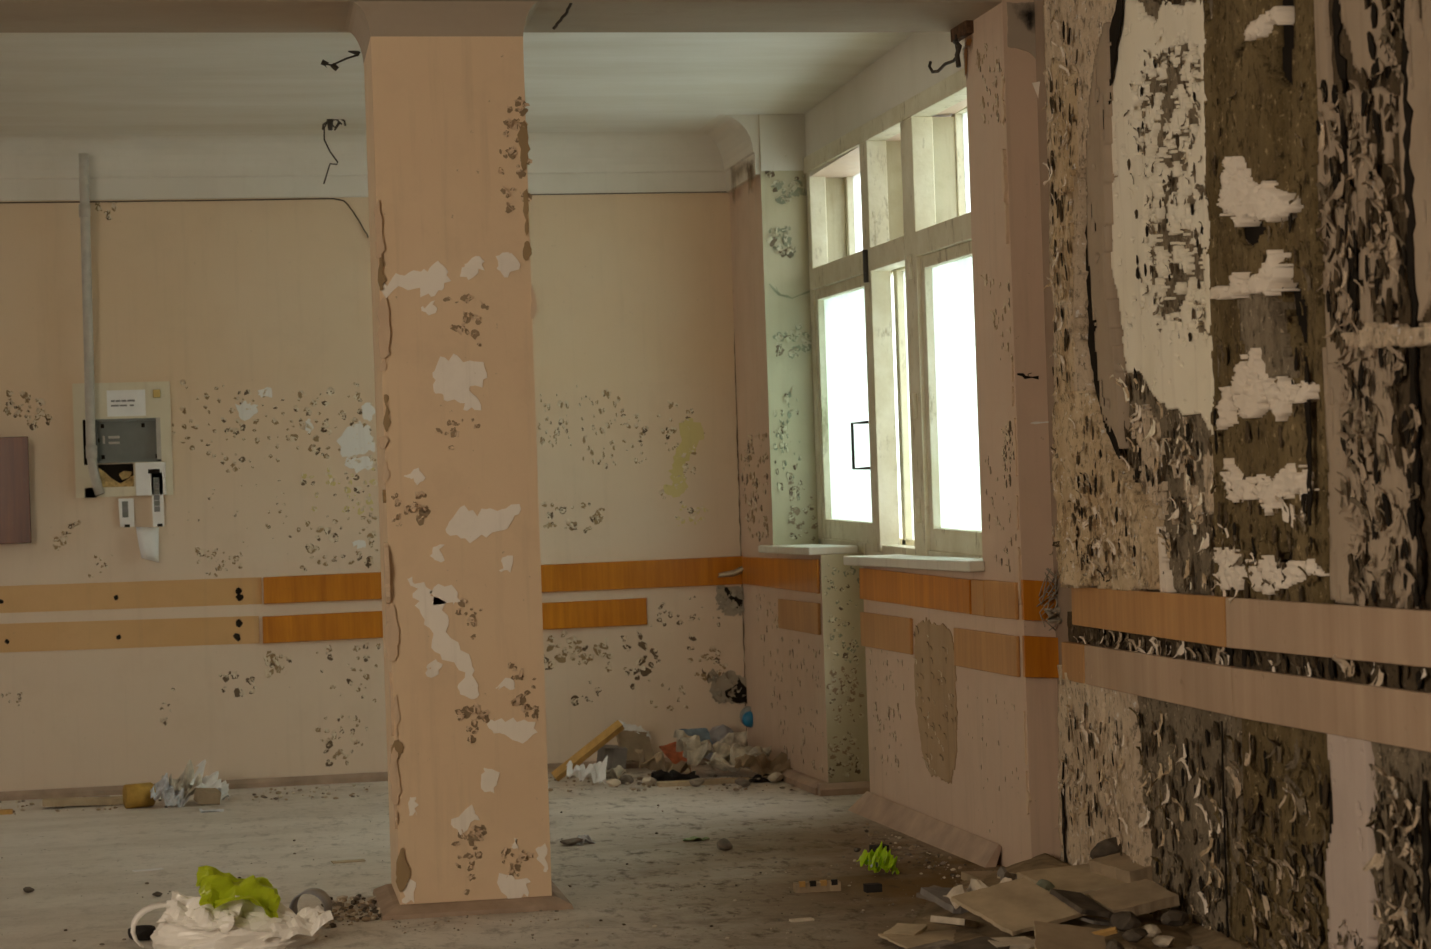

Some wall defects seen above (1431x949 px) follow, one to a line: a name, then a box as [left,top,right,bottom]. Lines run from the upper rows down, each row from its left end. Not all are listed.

flaking render [374,96,532,450]
spalling [98,464,134,487]
peeling [538,385,705,499]
peeling [739,387,818,542]
flaking render [430,504,521,562]
flaking render [172,380,431,829]
flaking render [408,577,747,744]
flaking render [1067,612,1431,693]
spalling [396,848,416,904]
flaking render [451,805,487,895]
flaking render [497,838,548,899]
flaking render [1055,665,1431,949]